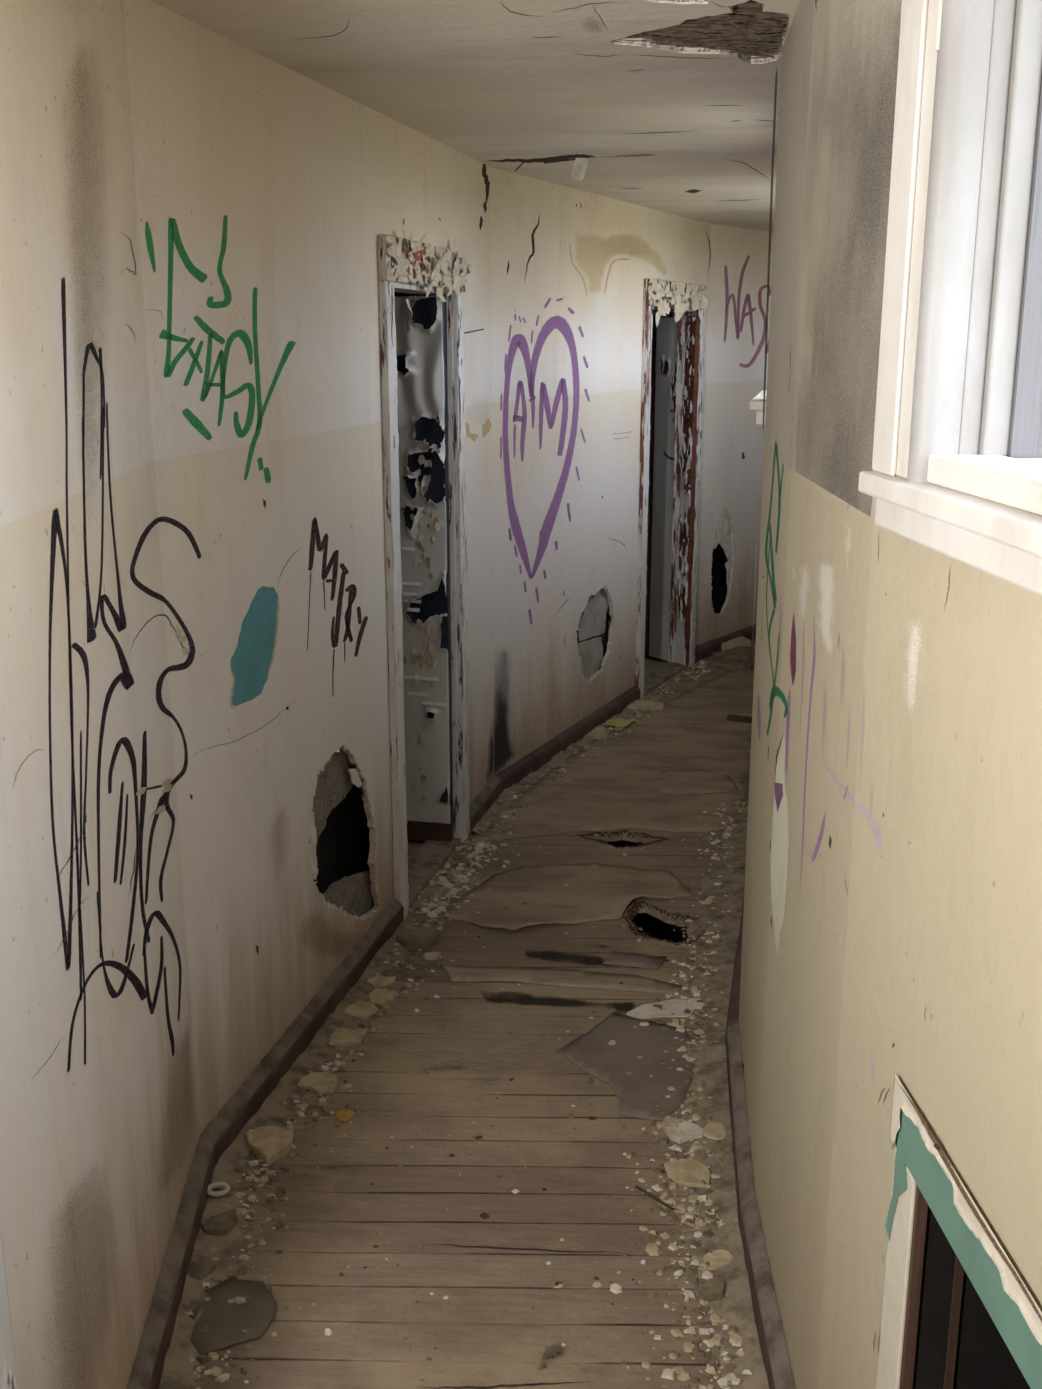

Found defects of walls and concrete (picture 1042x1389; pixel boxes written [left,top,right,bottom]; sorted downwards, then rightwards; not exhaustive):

crack [502,2,715,71]
crack [507,214,540,277]
crack [479,105,772,230]
peeling [639,278,735,700]
peeling [385,230,492,920]
spalling [576,584,615,684]
spalling [308,742,380,921]
peeling [889,1073,1042,1345]
peeling [0,1224,19,1389]